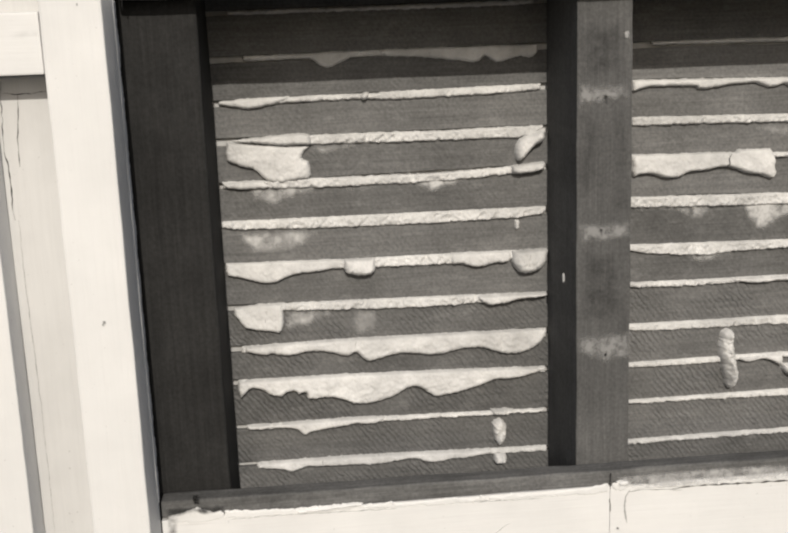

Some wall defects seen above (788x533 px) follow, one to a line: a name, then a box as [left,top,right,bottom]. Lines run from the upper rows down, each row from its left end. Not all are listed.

crack [0,88,55,527]
crack [609,473,788,522]